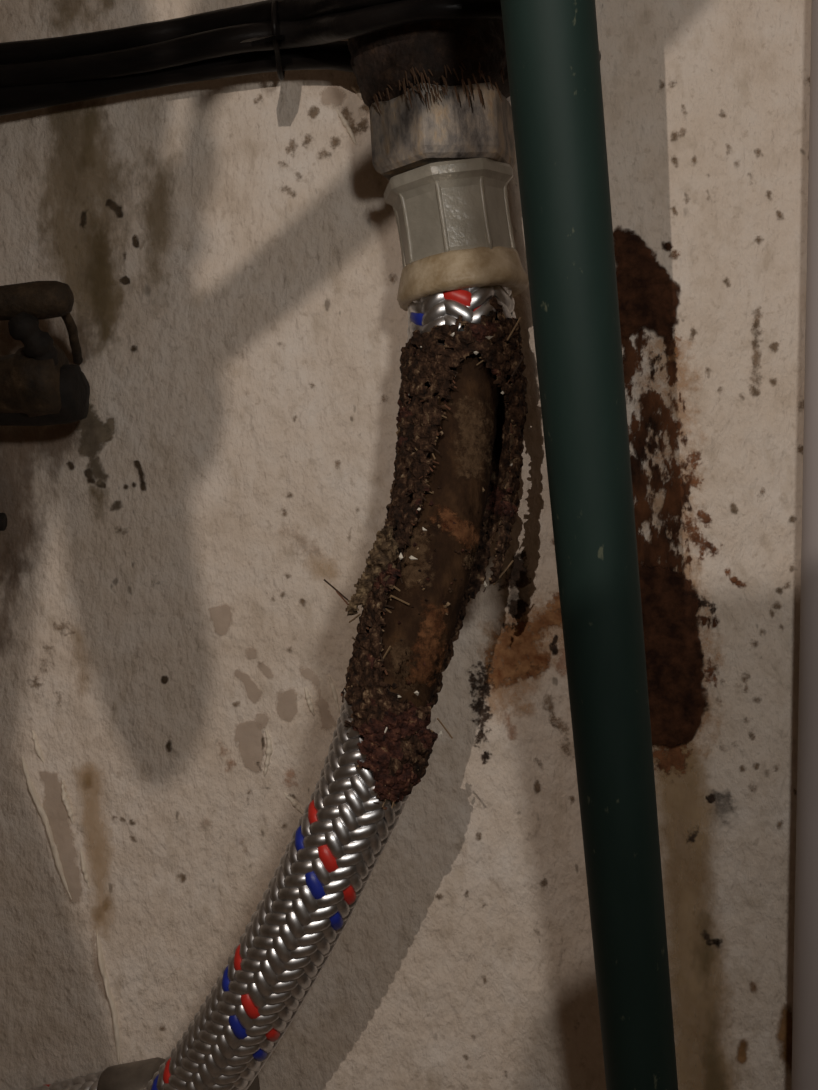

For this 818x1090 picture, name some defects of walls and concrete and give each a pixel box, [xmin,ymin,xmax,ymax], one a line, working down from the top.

leakage [48,102,130,339]
corrosion [613,227,722,759]
peeling [210,605,231,635]
corrosion [485,592,566,711]
peeling [228,669,340,777]